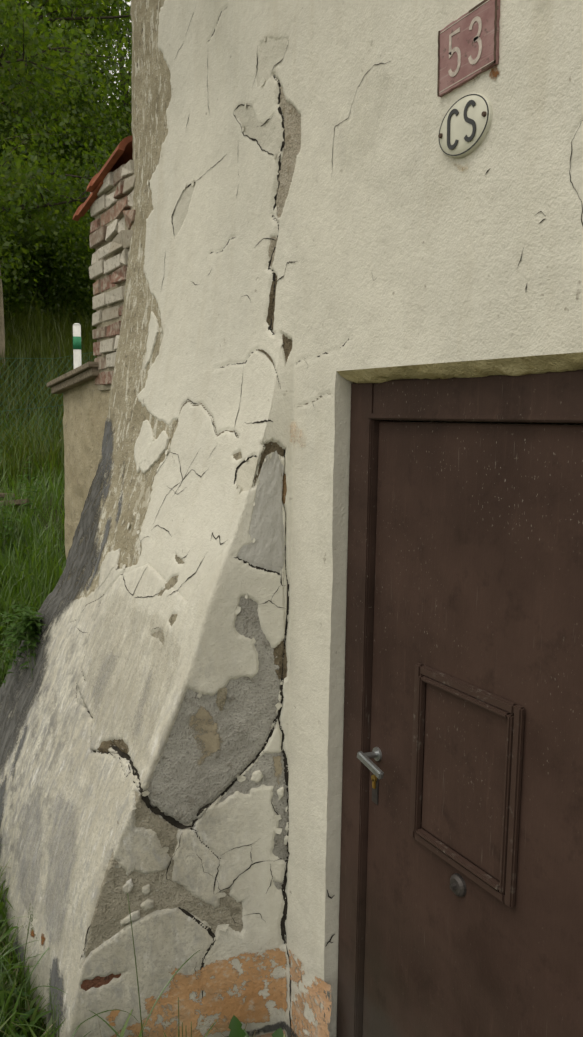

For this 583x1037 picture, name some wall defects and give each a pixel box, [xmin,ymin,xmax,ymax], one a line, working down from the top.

flaking render [234,36,301,218]
crack [569,120,583,226]
peeling [58,0,178,601]
flaking render [266,236,292,362]
flaking render [158,554,185,596]
crack [70,7,349,1028]
peeling [233,442,287,573]
peeling [81,595,289,961]
flaking render [81,973,121,991]
peeling [106,948,332,1037]